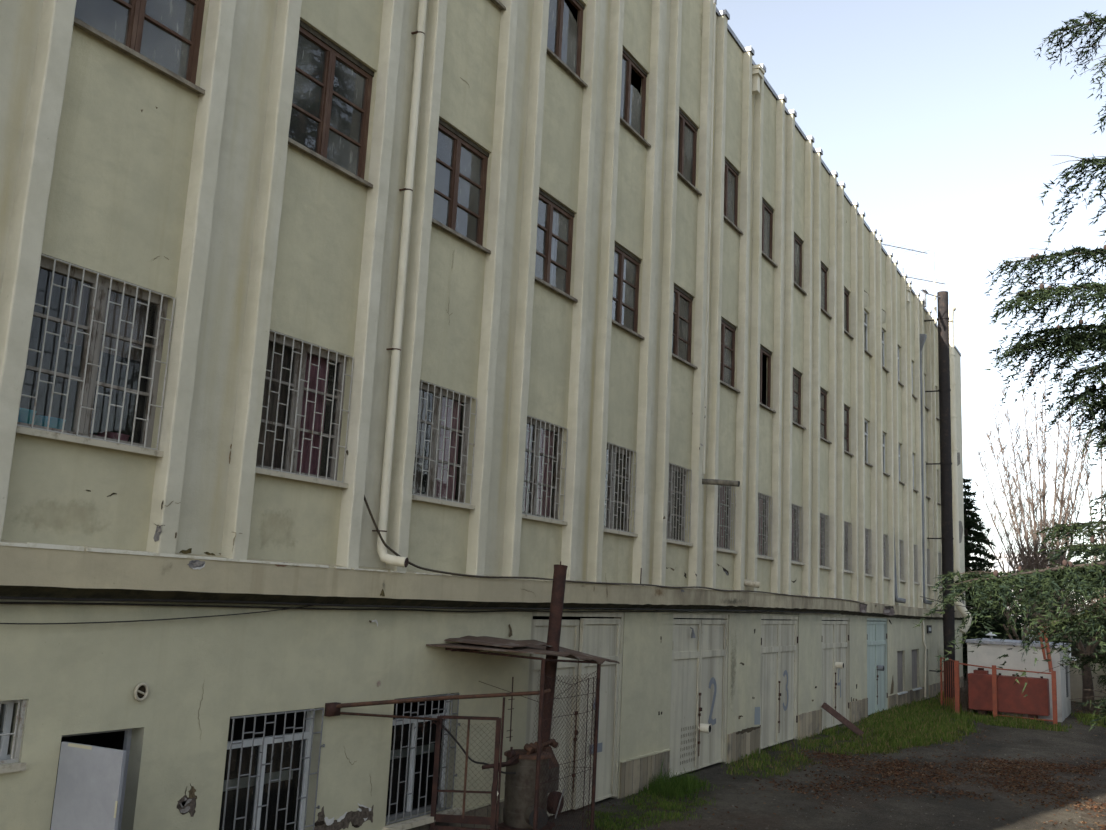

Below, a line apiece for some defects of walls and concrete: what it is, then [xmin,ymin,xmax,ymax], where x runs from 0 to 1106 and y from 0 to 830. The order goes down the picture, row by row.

spalling [177,784,197,817]
peeling [314,803,373,830]